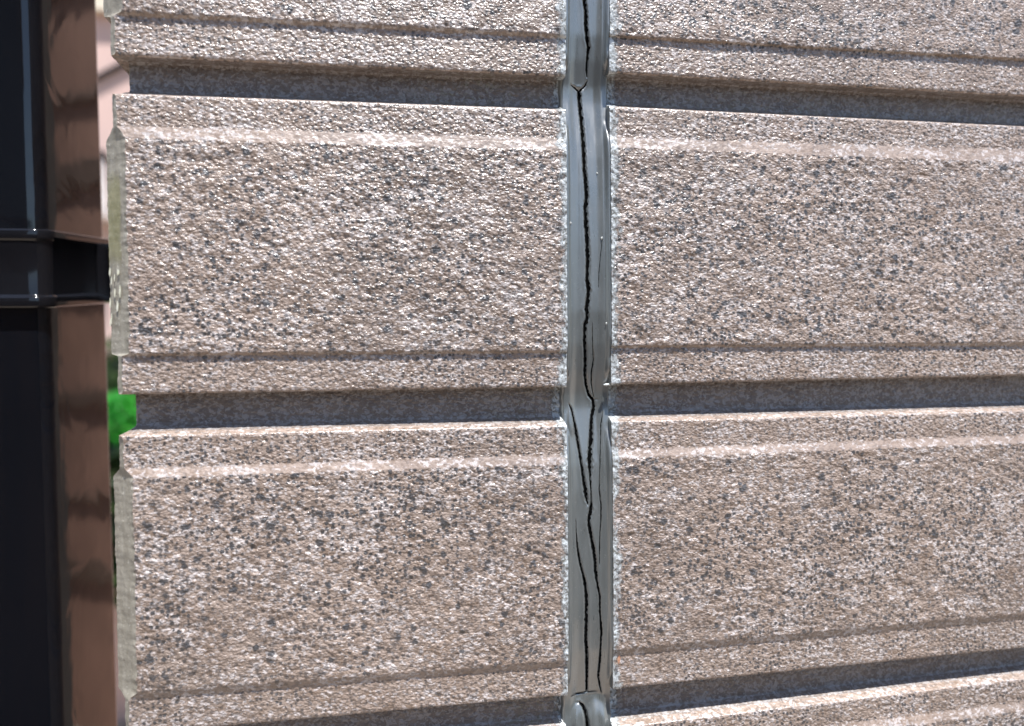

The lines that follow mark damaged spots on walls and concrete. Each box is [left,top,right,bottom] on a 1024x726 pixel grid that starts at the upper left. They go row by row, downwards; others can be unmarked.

crack [569,0,603,726]